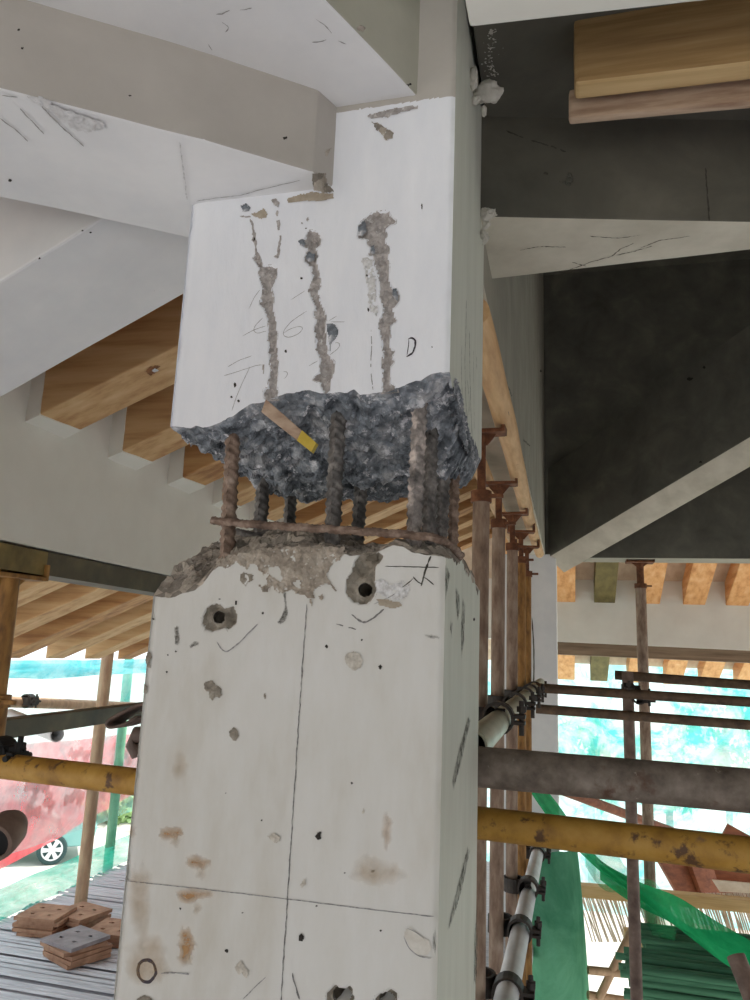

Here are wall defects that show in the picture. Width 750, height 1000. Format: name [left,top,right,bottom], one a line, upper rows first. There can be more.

spalling [240,173,334,219]
crack [568,235,688,271]
spalling [171,372,481,504]
spalling [154,529,479,649]